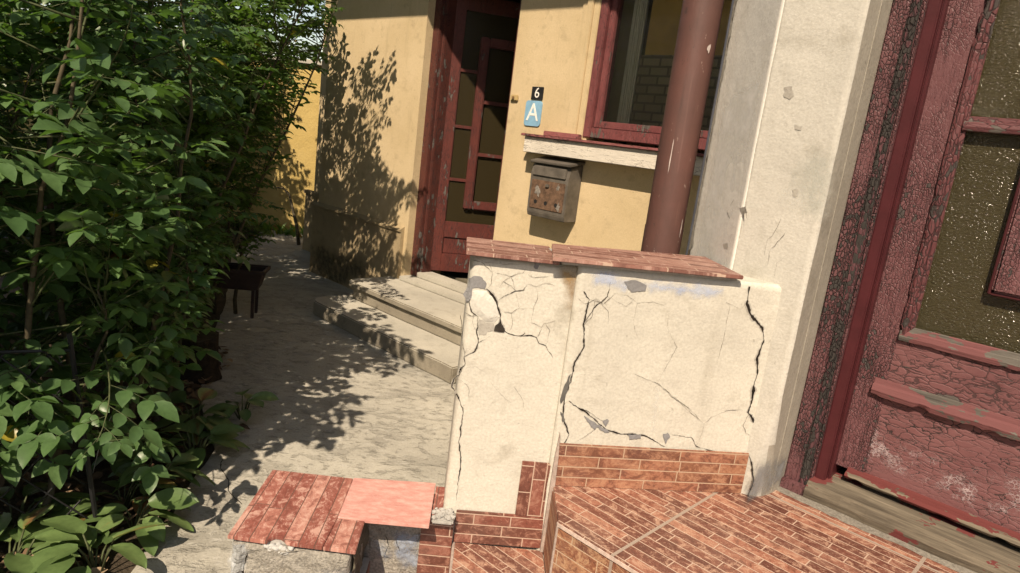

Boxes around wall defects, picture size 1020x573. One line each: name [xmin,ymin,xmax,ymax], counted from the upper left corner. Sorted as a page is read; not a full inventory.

peeling [463,276,505,335]
crack [451,260,765,500]